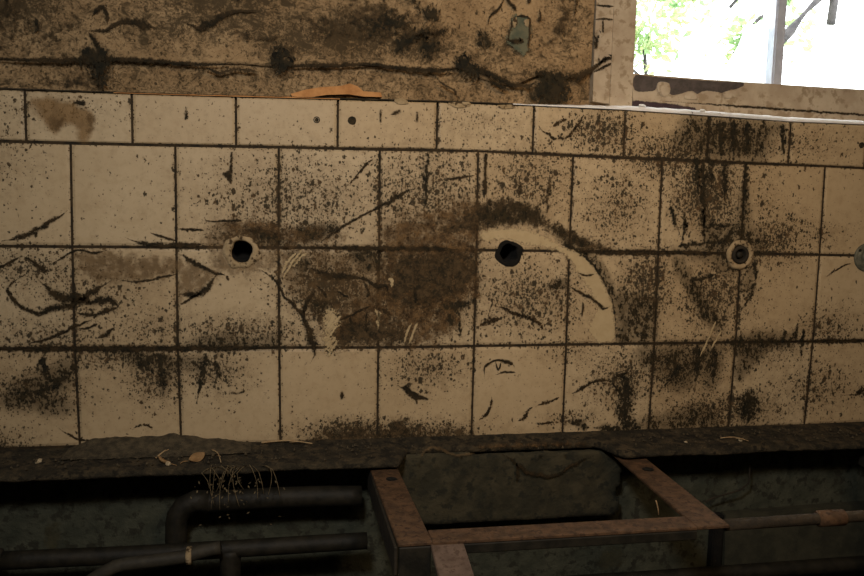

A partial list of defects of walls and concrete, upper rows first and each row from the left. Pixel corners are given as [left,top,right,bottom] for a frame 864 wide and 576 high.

crack [0,0,614,96]
crack [0,213,241,343]
crack [261,268,390,362]
leakage [311,245,456,271]
leakage [440,111,864,430]
leakage [0,329,282,415]